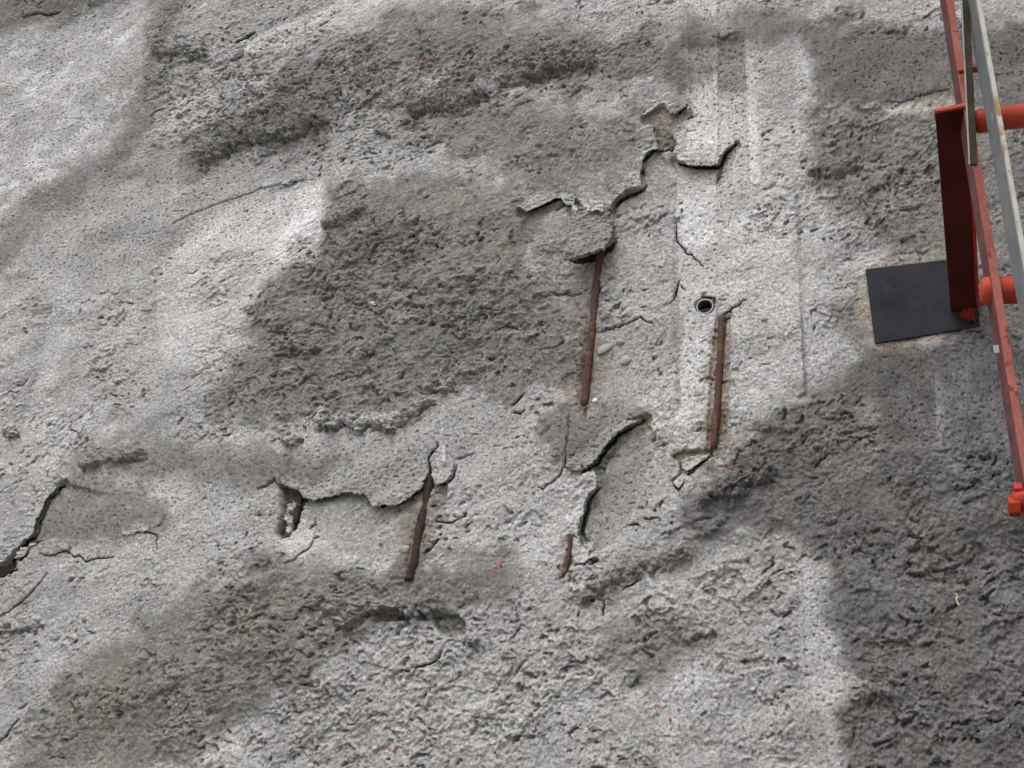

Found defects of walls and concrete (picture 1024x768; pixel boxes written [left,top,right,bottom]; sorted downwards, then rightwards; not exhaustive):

spalling [517,101,736,287]
crack [0,485,113,617]
spalling [276,435,455,539]
crack [538,410,645,616]
spalling [557,420,653,592]
spalling [673,317,738,498]